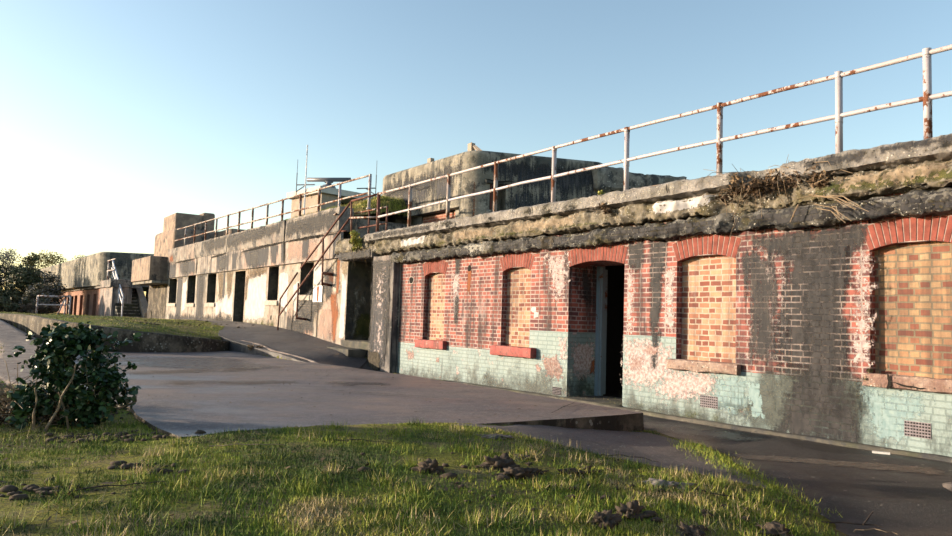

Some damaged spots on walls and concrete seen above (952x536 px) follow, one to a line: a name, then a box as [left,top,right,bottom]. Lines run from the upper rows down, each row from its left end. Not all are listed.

water stain [384,160,462,212]
water stain [483,155,594,209]
water stain [169,210,391,371]
rust [317,260,341,342]
water stain [419,231,597,324]
water stain [605,217,716,369]
water stain [737,190,952,443]
peeling [620,336,765,419]